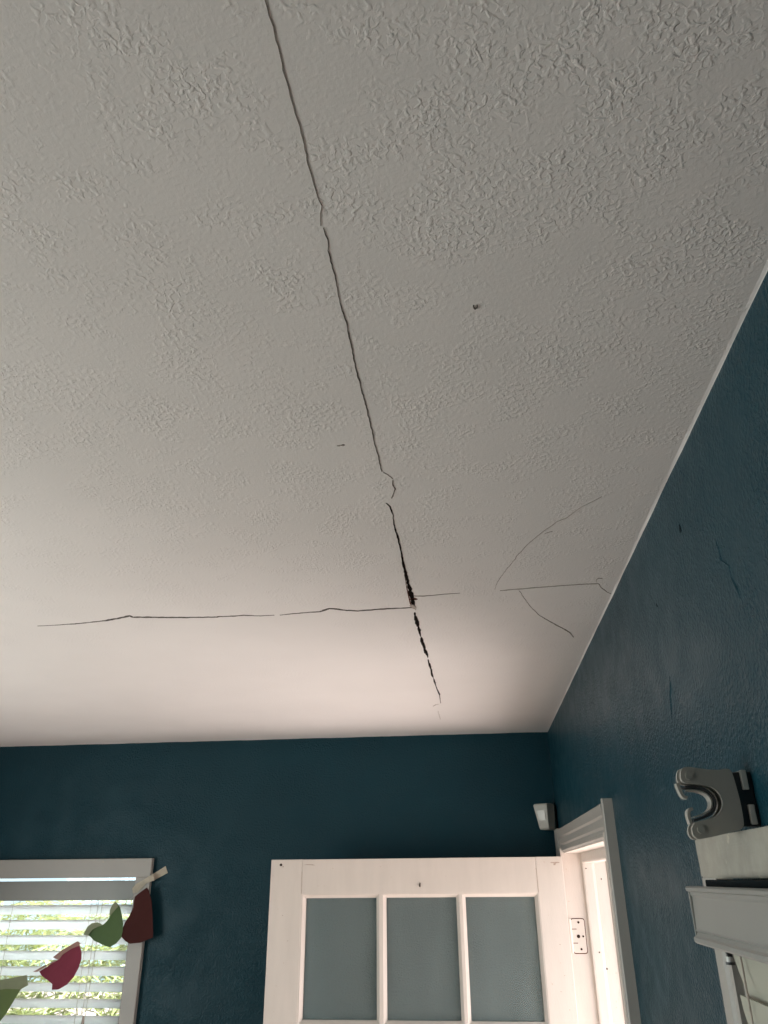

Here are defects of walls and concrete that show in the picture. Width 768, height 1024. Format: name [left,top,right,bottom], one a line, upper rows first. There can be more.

crack [46,0,458,717]
crack [495,497,611,637]